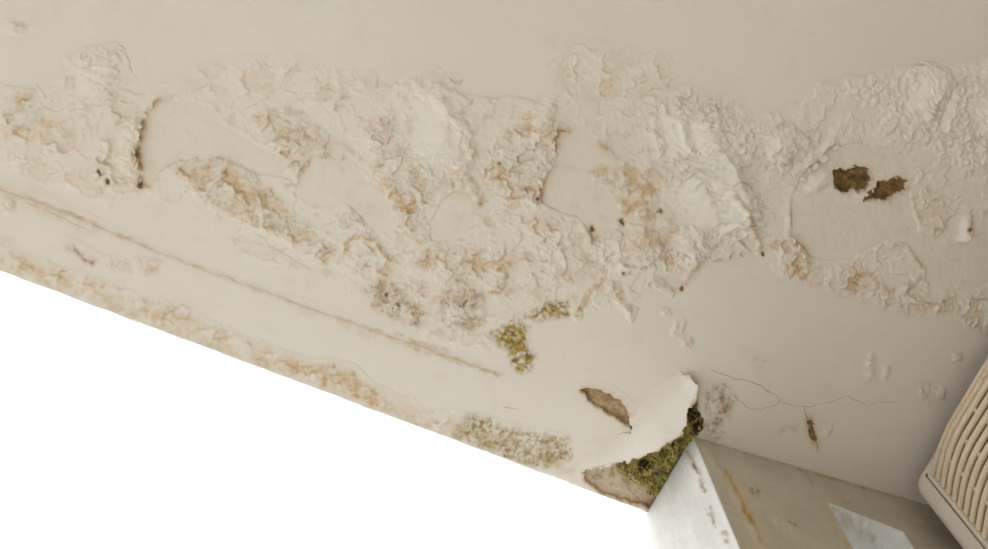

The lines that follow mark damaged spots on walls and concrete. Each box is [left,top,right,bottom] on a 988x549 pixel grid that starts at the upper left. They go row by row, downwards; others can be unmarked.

peeling [0,82,685,324]
peeling [762,126,988,335]
water stain [456,410,577,474]
spalling [572,457,656,512]
spalling [672,367,703,413]
peeling [653,446,732,546]
crack [712,370,890,491]